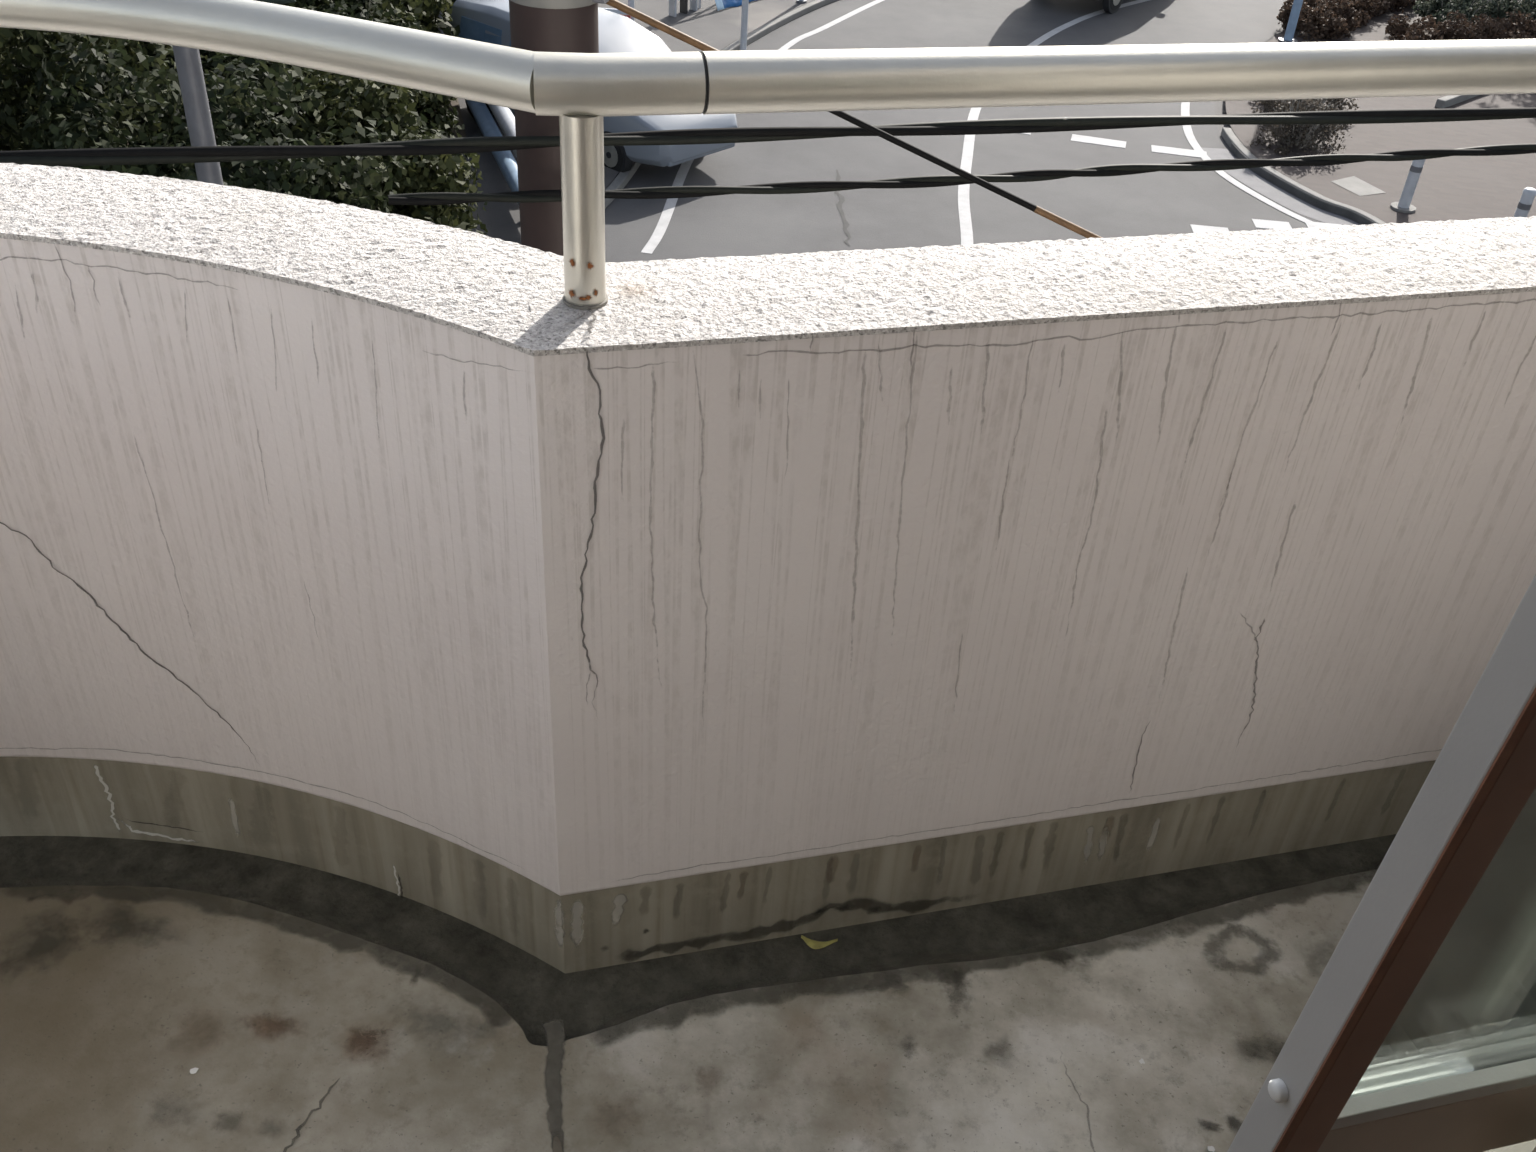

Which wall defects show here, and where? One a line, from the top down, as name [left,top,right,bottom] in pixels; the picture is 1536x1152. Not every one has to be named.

crack [580,309,605,687]
crack [0,522,256,759]
damp [94,765,197,842]
damp [9,878,512,1025]
damp [556,902,583,944]
damp [596,870,1376,1044]
crack [283,1079,339,1152]
crack [543,1020,565,1152]